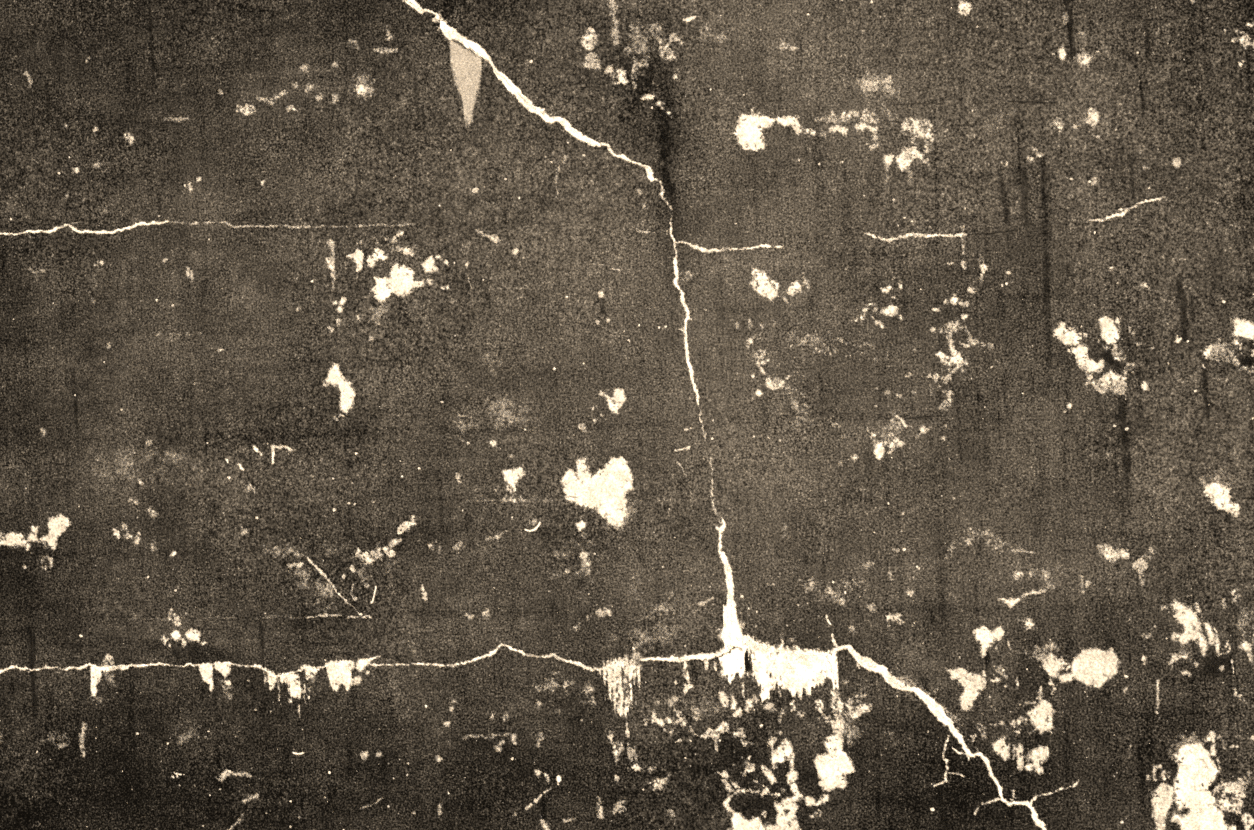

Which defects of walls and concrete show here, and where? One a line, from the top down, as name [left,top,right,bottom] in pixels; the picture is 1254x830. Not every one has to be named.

crack [403,0,663,195]
spalling [734,103,934,171]
crack [0,221,306,235]
spalling [347,232,448,307]
crack [868,229,1017,265]
crack [645,228,782,451]
spalling [561,456,633,531]
crack [0,505,743,737]
spalling [644,692,871,830]
crack [826,615,1077,830]
spalling [993,643,1118,774]
spalling [1147,732,1254,830]